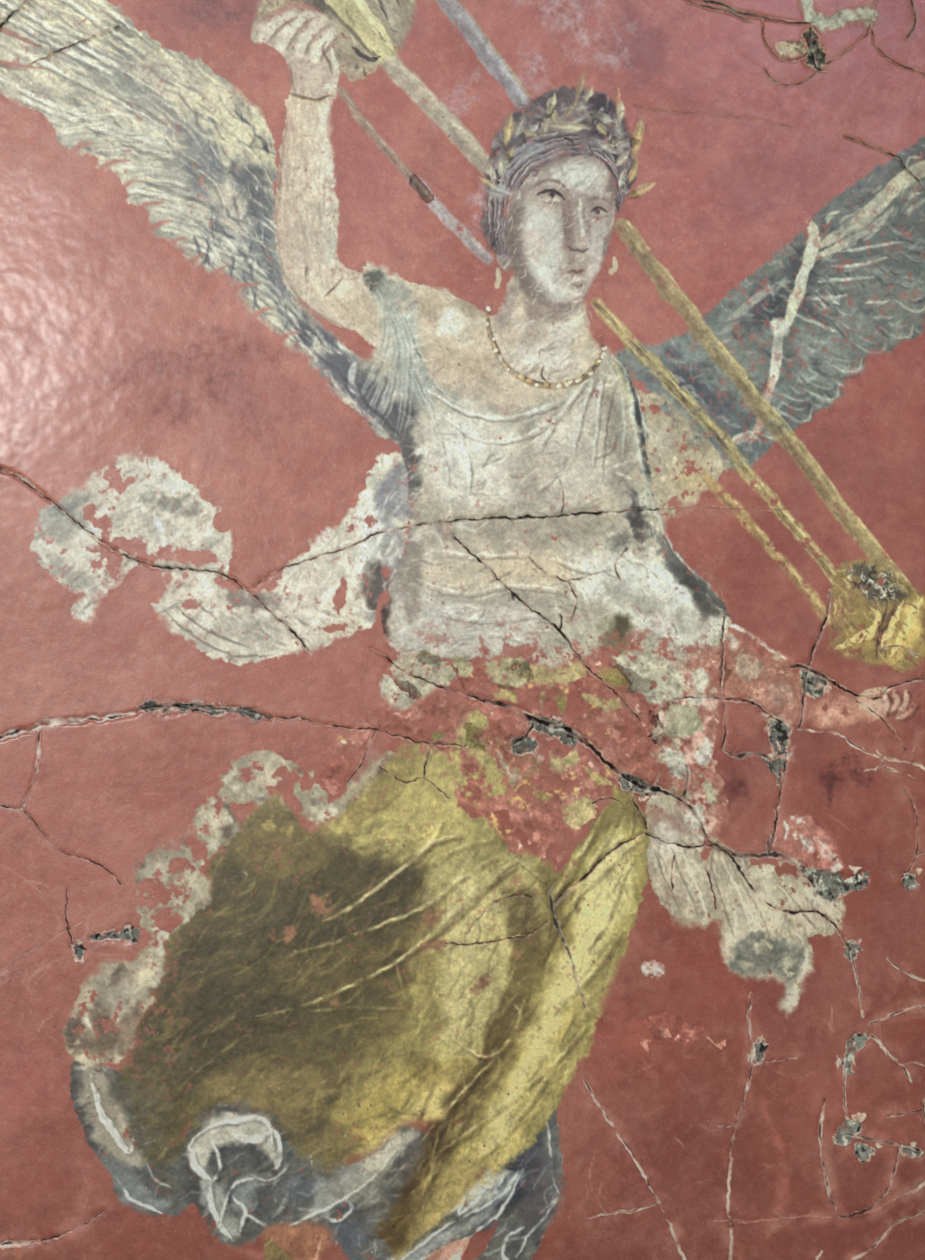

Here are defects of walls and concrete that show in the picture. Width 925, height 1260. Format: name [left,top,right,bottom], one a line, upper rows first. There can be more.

crack [0,0,30,32]
crack [27,24,122,66]
crack [682,0,925,87]
spalling [774,0,883,71]
crack [0,465,796,723]
peeling [317,631,834,871]
crack [0,702,468,974]
peeling [770,812,871,909]
spalling [68,924,141,968]
crack [370,567,925,1260]
spalling [831,1111,884,1164]
spalling [900,1141,924,1162]